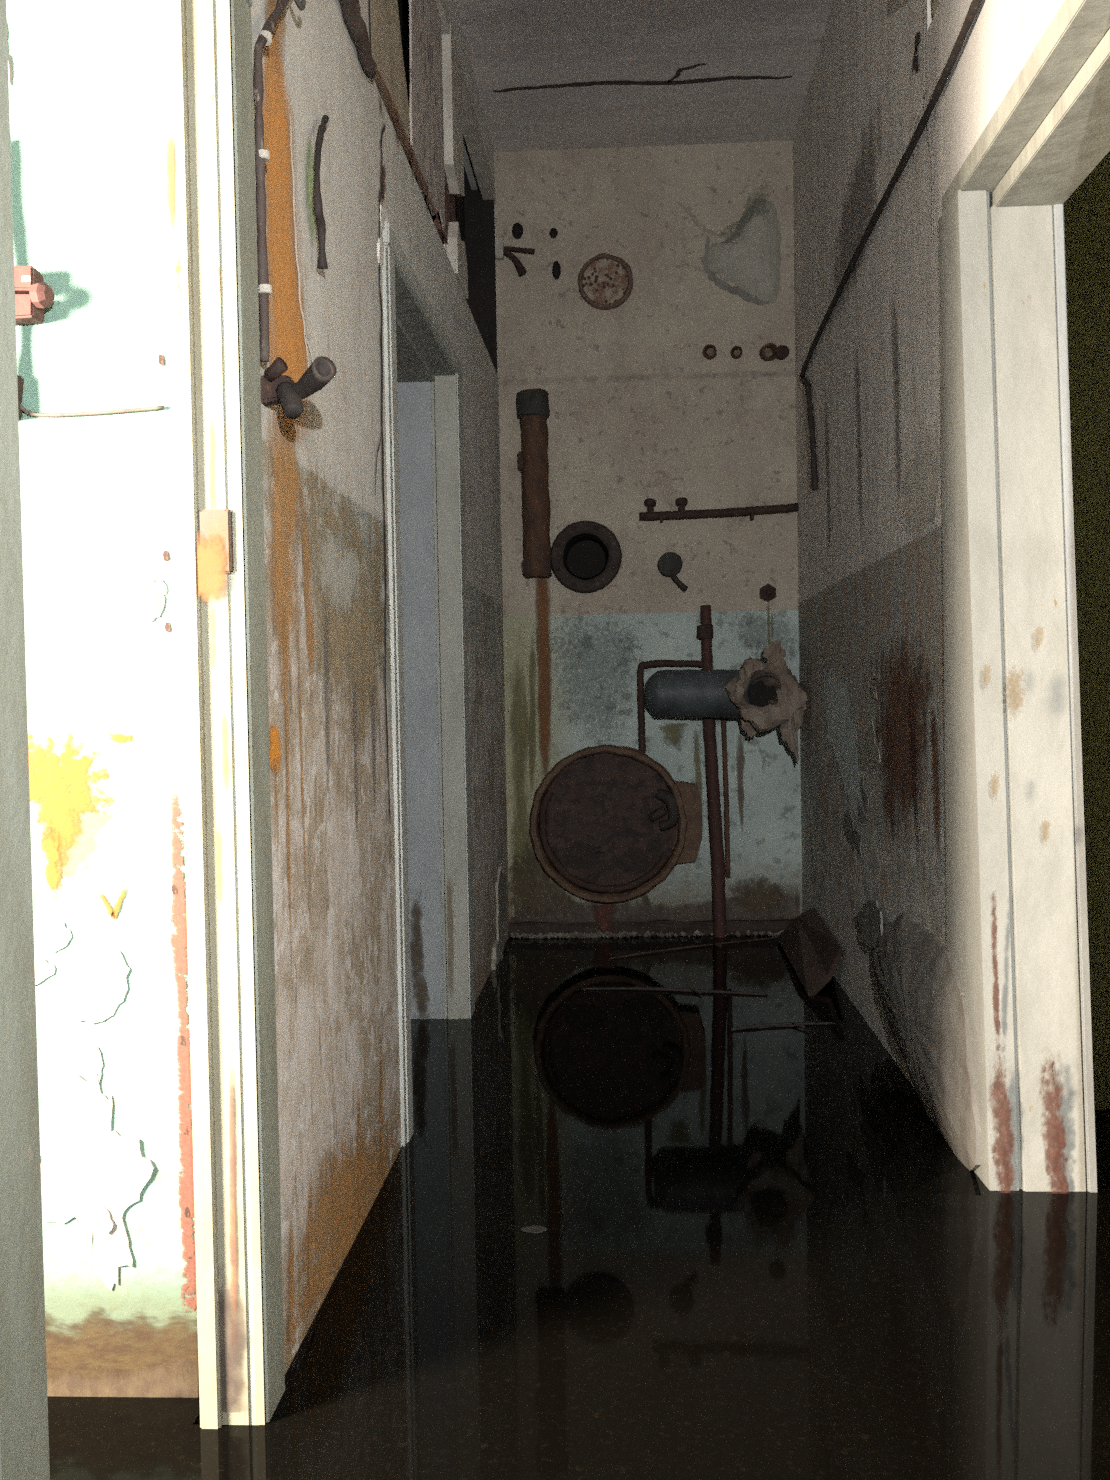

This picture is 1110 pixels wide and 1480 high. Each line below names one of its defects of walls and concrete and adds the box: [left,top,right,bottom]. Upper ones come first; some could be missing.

crack [493,64,792,92]
water stain [311,485,382,813]
water stain [508,678,800,923]
corrosion [875,644,940,848]
peeling [35,921,72,985]
peeling [41,1047,155,1291]
peeling [170,792,197,1312]
corrosion [991,894,1014,1193]
corrosion [1040,1062,1069,1194]